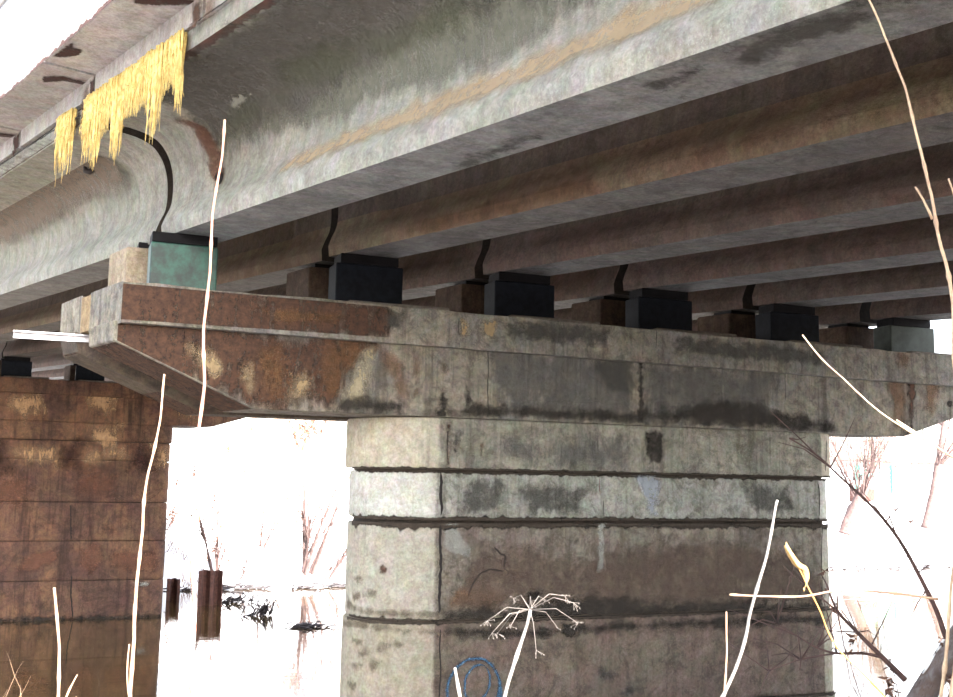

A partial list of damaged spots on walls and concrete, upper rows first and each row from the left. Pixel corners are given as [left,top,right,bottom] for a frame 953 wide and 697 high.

corrosion [175,119,224,185]
corrosion [92,283,404,415]
water stain [508,323,609,346]
water stain [676,337,822,365]
water stain [341,397,402,414]
water stain [434,352,835,466]
corrosion [890,382,936,435]
water stain [463,479,503,513]
water stain [521,486,584,515]
water stain [745,484,794,511]
crack [468,547,509,596]